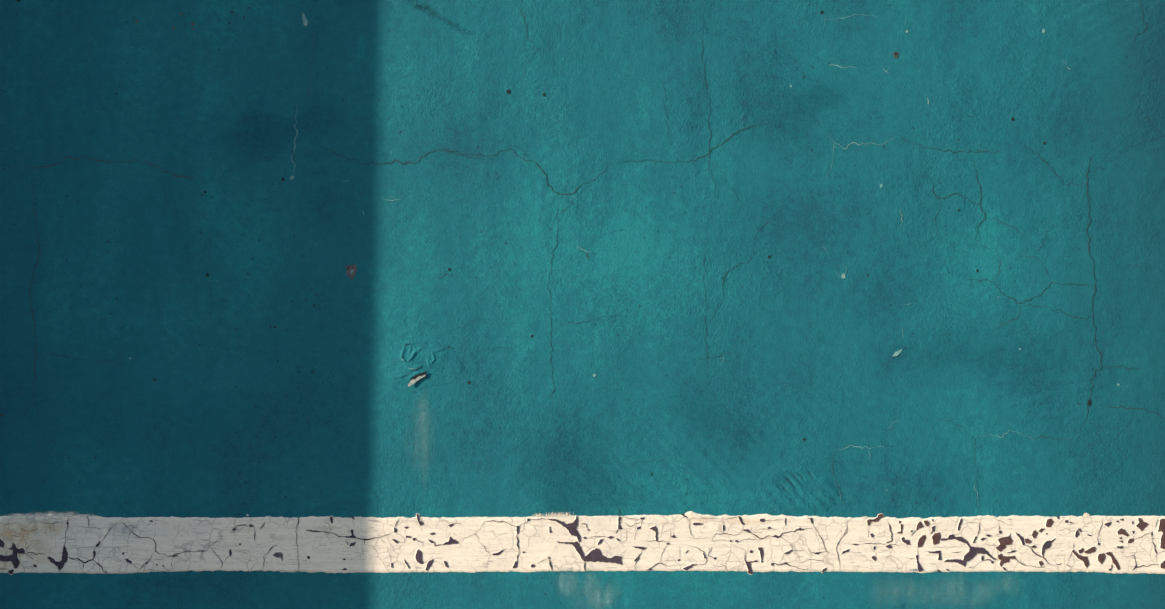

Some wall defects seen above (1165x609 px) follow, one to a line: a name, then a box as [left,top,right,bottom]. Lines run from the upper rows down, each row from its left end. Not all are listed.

crack [3,32,773,426]
crack [827,131,1165,507]
peeling [0,516,70,575]
peeling [306,513,483,571]
peeling [530,510,711,572]
peeling [721,547,764,575]
peeling [853,513,1165,572]